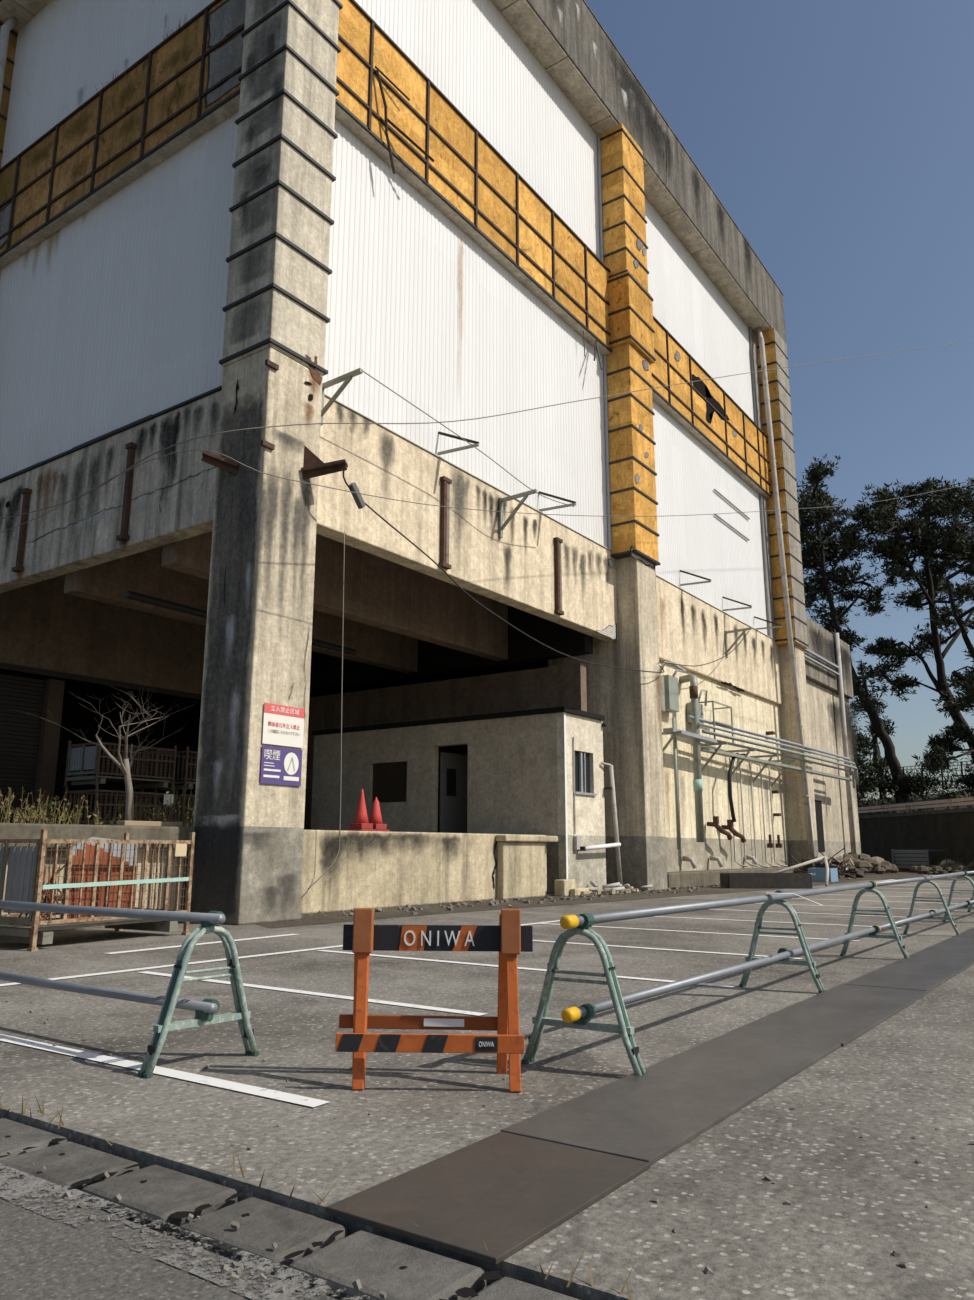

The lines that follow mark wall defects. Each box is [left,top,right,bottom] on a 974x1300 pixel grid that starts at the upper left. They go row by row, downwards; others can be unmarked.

water stain [593,43,671,167]
water stain [337,404,369,432]
spalling [692,374,737,437]
water stain [382,437,393,465]
water stain [0,487,22,552]
water stain [61,449,116,528]
water stain [455,474,537,536]
water stain [565,545,609,581]
water stain [138,402,311,914]
water stain [681,601,718,637]
water stain [735,628,773,667]
water stain [324,833,460,867]